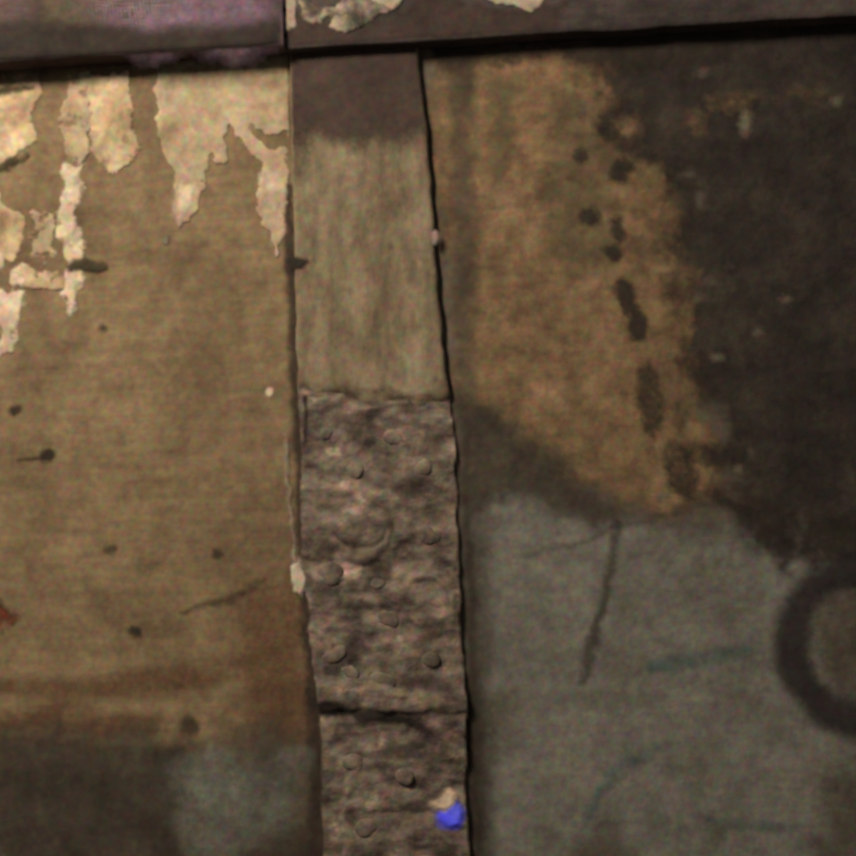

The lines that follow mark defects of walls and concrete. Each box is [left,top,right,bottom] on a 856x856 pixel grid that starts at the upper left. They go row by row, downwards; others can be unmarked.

peeling [286,0,402,32]
damp [288,0,565,44]
peeling [489,0,544,12]
peeling [0,69,141,356]
peeling [152,55,289,257]
damp [434,24,856,856]
damp [291,541,306,595]
crack [284,185,431,856]
crack [583,546,614,680]
damp [0,723,315,856]